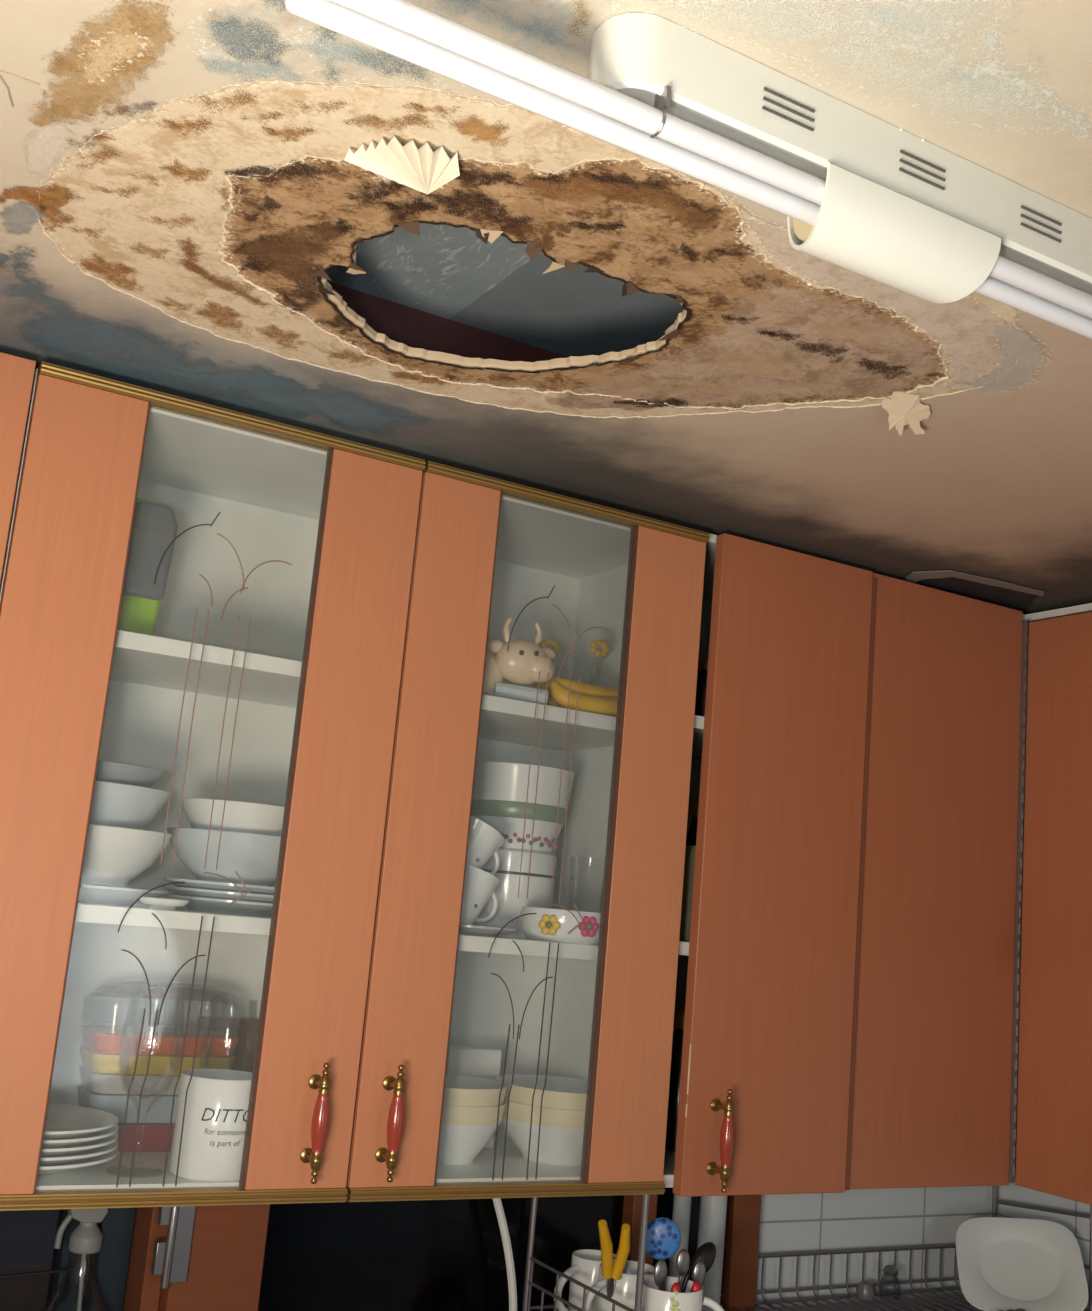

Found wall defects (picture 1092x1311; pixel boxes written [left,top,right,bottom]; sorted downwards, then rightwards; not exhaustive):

leakage [23,0,469,129]
leakage [406,0,1092,143]
peeling [31,76,1046,436]
leakage [216,153,1054,412]